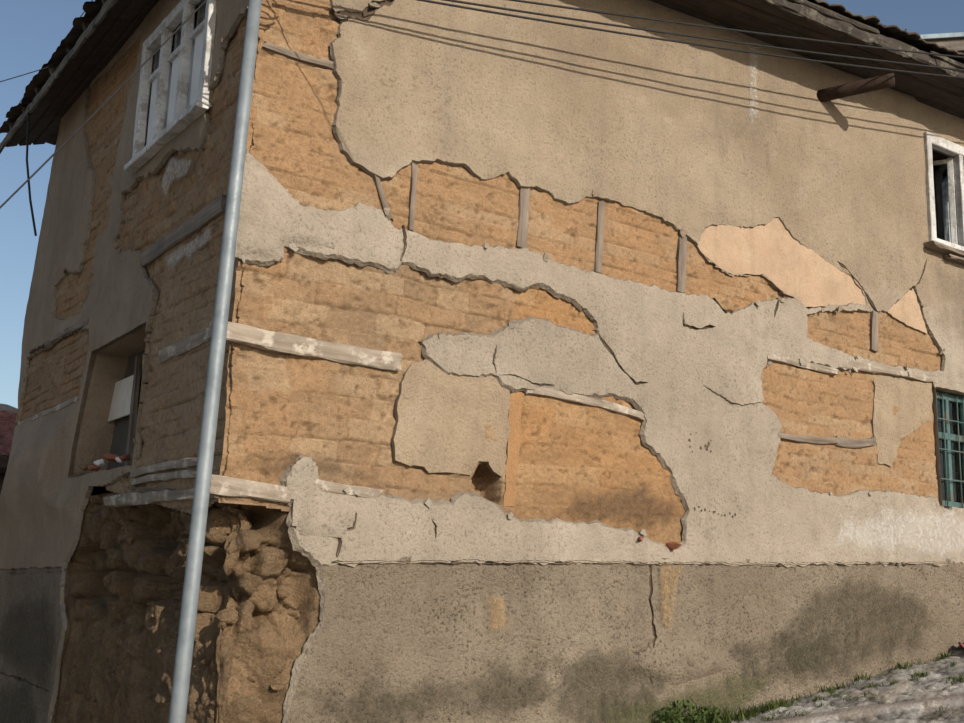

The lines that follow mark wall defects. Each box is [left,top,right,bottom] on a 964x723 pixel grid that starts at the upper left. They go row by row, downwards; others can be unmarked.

flaking render [14,6,248,514]
flaking render [208,0,946,723]
crack [599,334,647,385]
crack [837,261,879,313]
spalling [47,497,89,723]
crack [332,513,954,653]